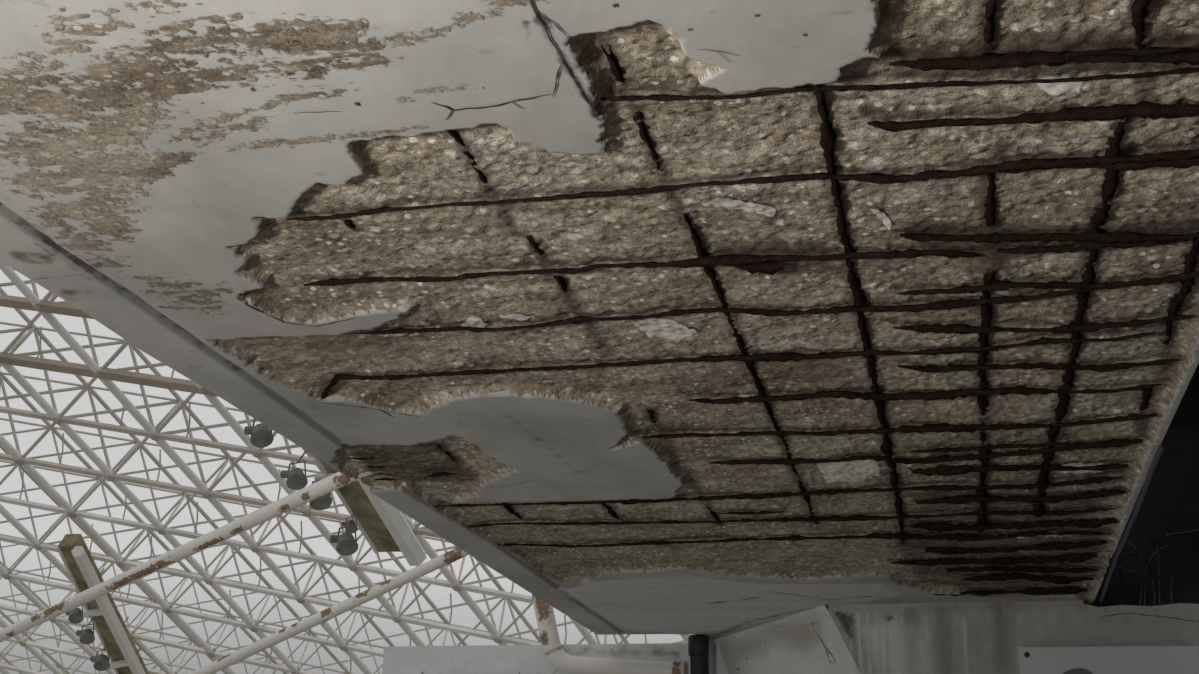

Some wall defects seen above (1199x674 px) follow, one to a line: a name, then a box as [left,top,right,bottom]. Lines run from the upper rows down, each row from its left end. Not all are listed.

crack [431,0,600,120]
water stain [559,53,603,121]
water stain [28,224,109,279]
spalling [208,0,1199,604]
rust [444,547,462,564]